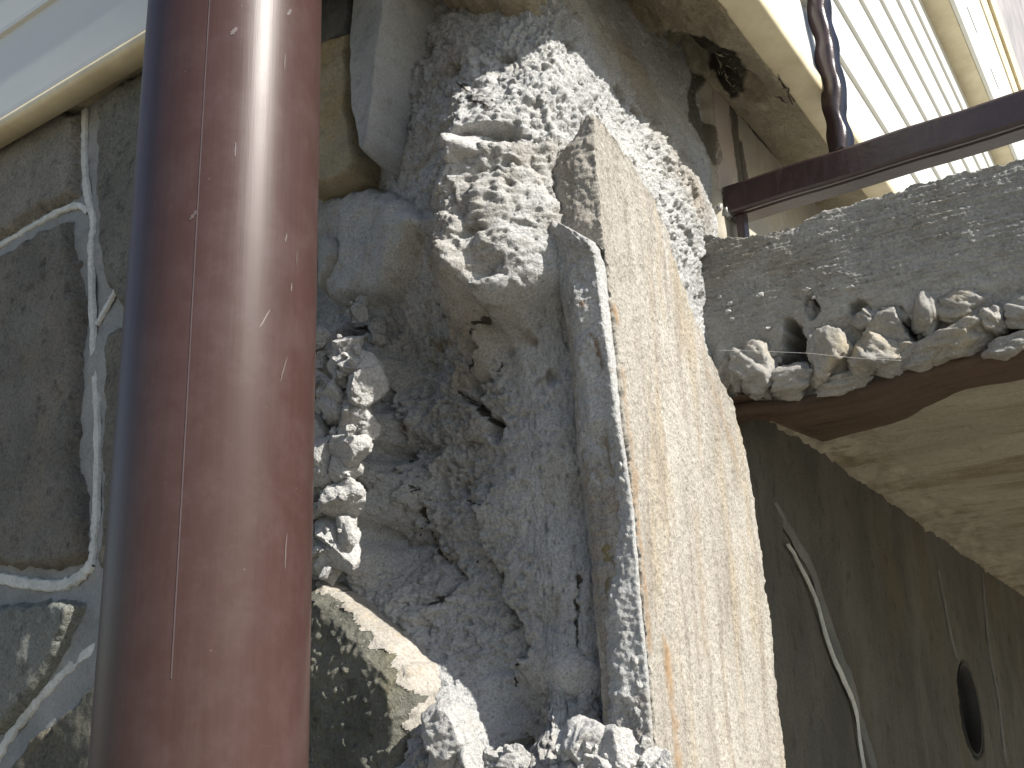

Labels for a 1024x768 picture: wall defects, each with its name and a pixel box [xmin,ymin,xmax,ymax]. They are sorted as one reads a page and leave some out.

crack [457,316,506,428]
spalling [717,287,1024,401]
crack [408,459,504,610]
crack [574,568,583,648]
spalling [630,655,650,741]